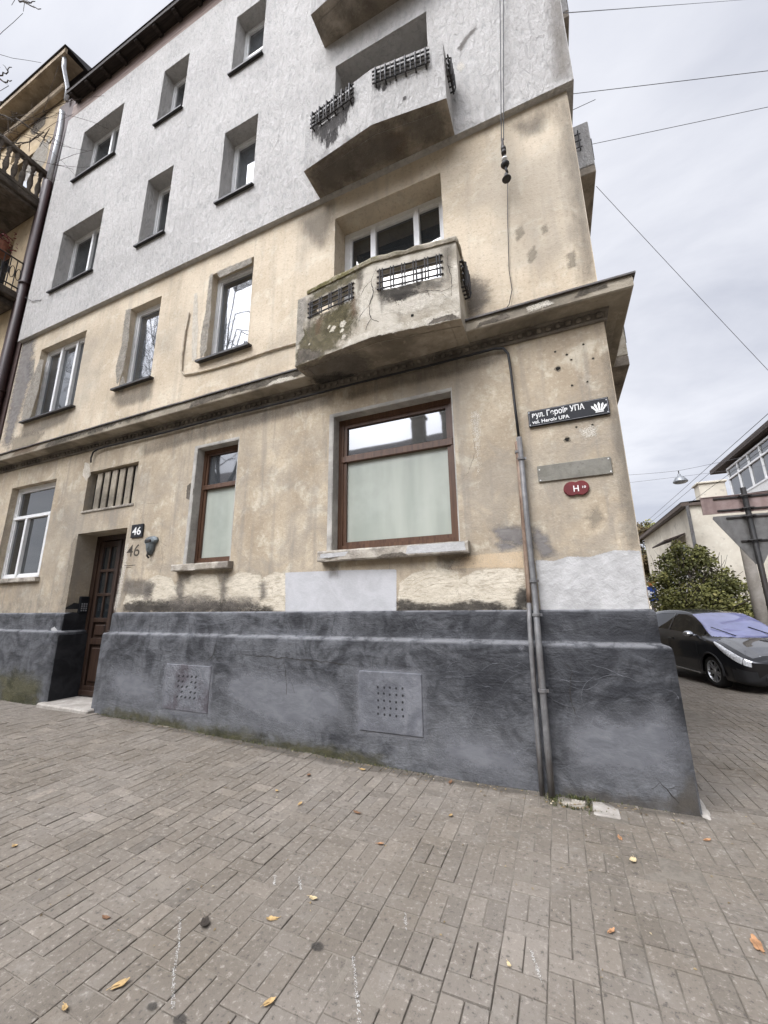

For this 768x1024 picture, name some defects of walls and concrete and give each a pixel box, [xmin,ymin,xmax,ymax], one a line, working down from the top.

leakage [312,98,401,191]
flaking render [328,272,460,349]
crack [358,259,453,328]
leakage [494,526,553,557]